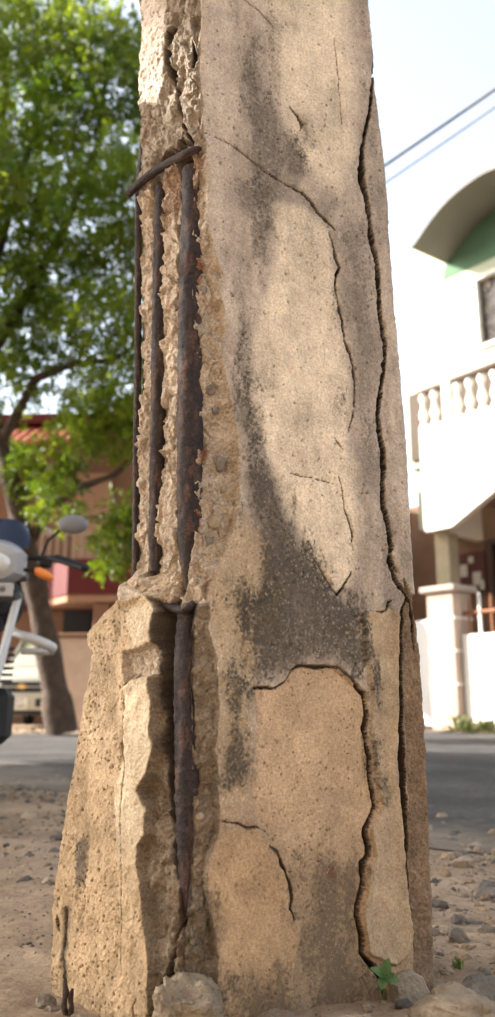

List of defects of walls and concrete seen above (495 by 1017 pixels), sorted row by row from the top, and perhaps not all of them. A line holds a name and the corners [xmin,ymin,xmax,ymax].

crack [230,0,274,27]
peeling [122,0,434,1017]
crack [165,22,415,904]
leakage [218,323,383,793]